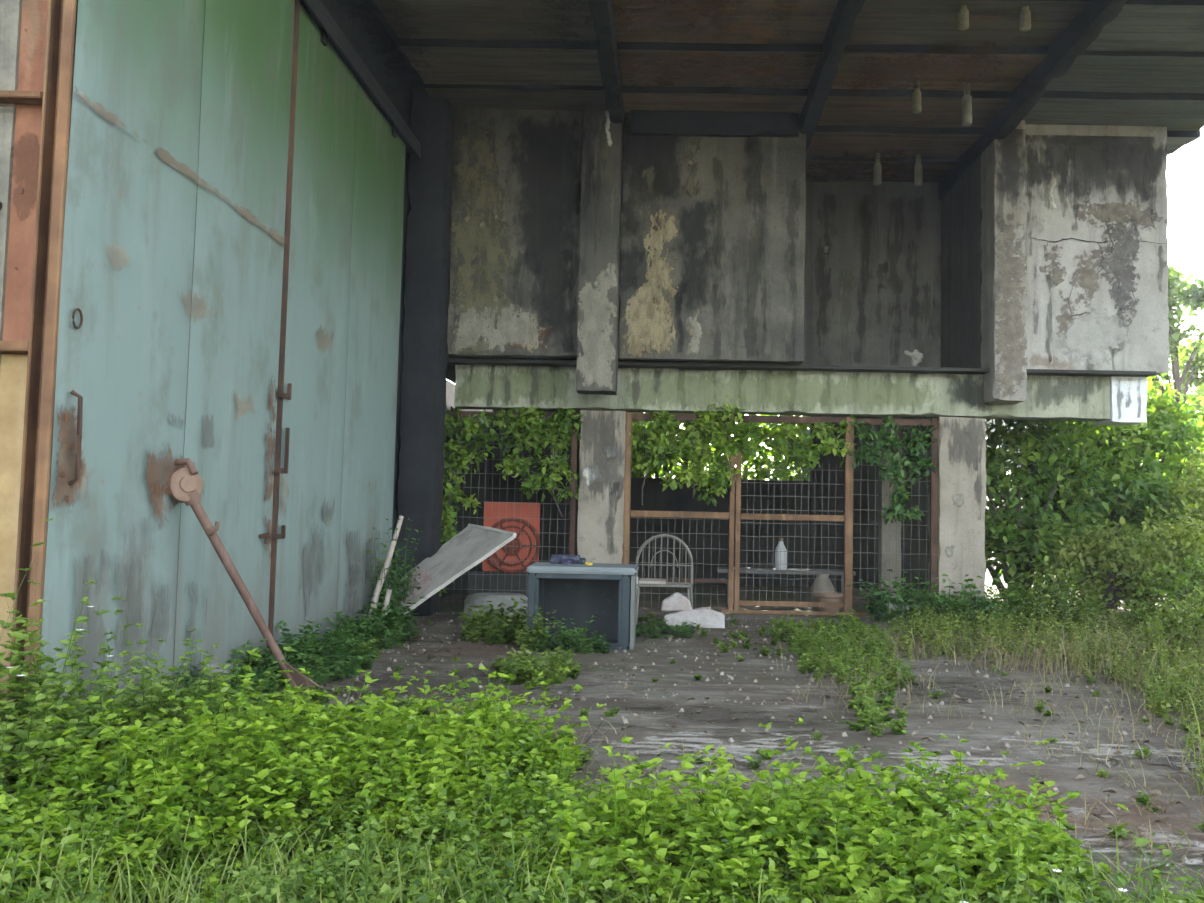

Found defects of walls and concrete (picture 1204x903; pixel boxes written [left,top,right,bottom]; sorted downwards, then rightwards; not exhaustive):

rust [158,148,286,245]
leakage [508,117,581,352]
spalling [576,166,703,390]
leakage [605,110,680,291]
leakage [675,202,714,352]
leakage [998,129,1167,209]
crack [1034,225,1163,329]
rust [52,408,86,507]
rust [146,448,185,524]